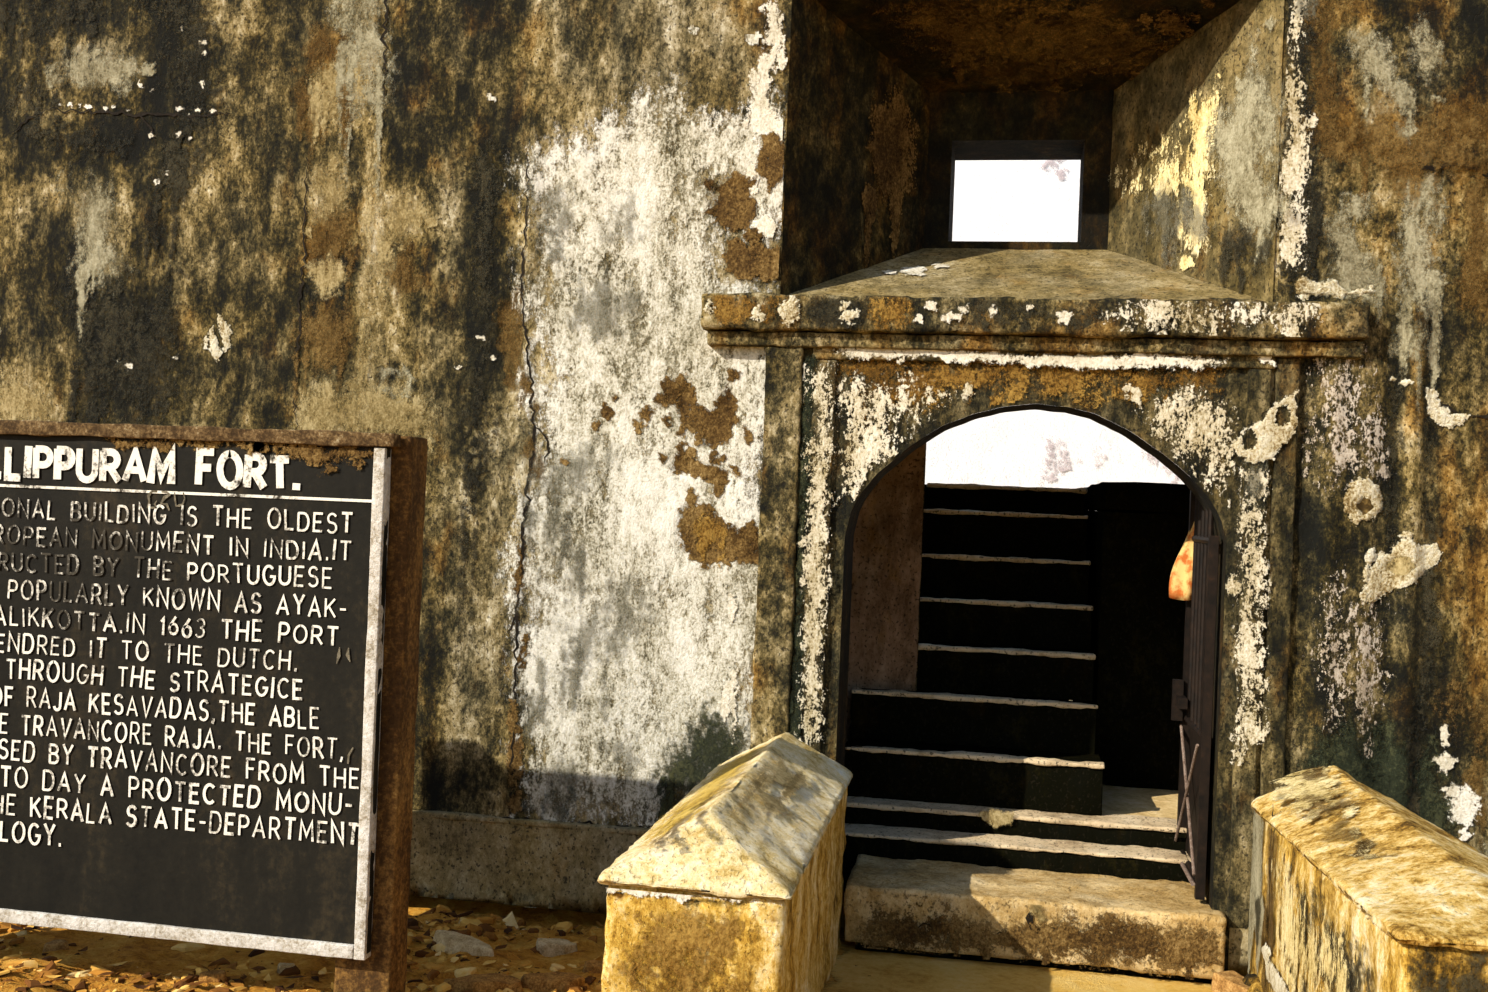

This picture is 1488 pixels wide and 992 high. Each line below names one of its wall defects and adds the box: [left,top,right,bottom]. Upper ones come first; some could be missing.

leakage [0,0,229,425]
leakage [307,0,393,432]
crack [464,151,653,828]
peeling [476,0,800,828]
leakage [597,668,758,843]
leakage [788,354,819,739]
spalling [839,300,860,324]
spalling [913,301,969,324]
leakage [836,360,1228,416]
peeling [794,341,1471,766]
peeling [1102,0,1376,337]
leakage [1147,0,1447,545]